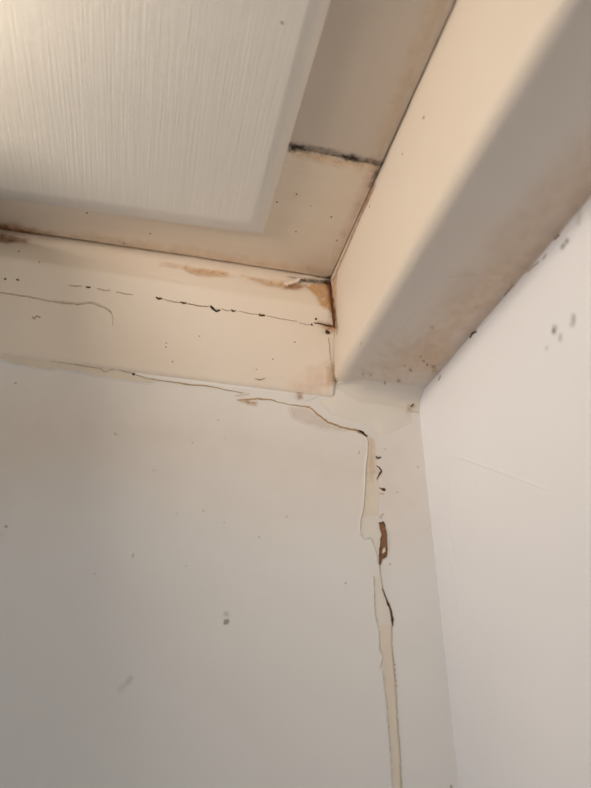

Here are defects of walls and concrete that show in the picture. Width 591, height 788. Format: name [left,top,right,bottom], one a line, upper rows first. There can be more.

crack [0,284,133,324]
crack [156,297,335,381]
crack [158,380,368,437]
peeling [359,436,389,565]
peeling [372,576,401,788]
crack [379,565,402,788]